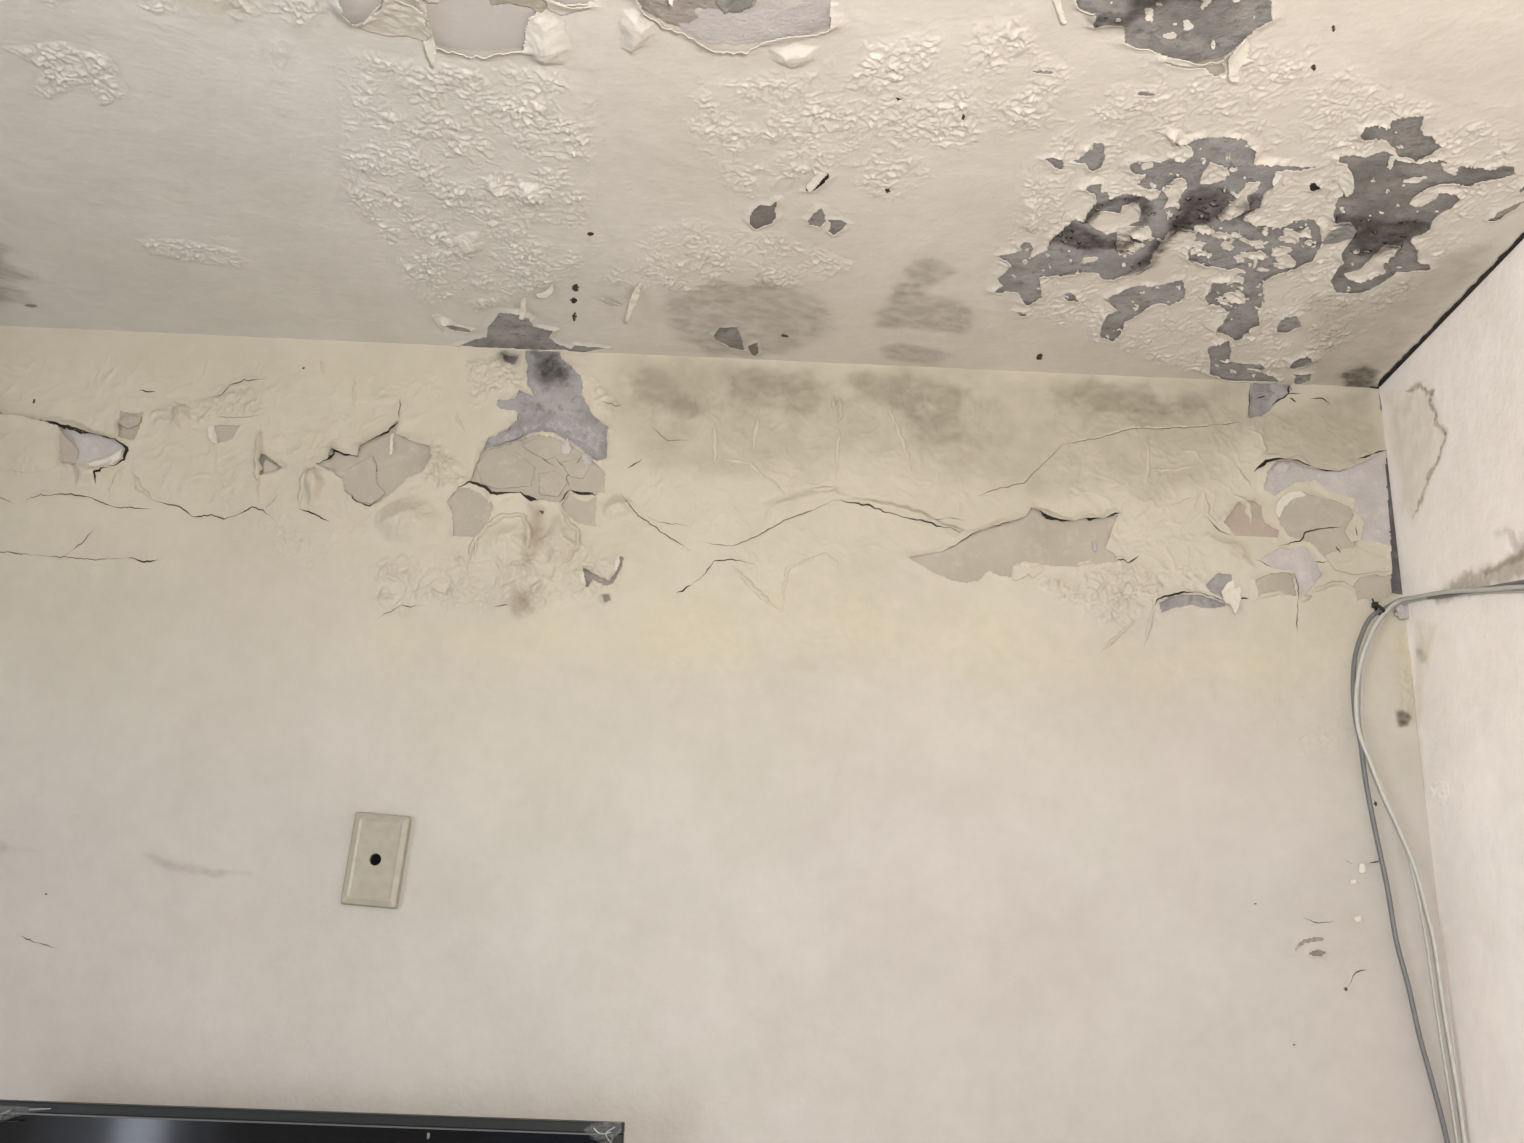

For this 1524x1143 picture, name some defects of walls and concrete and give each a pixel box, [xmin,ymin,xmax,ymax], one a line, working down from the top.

peeling [323,0,854,68]
spalling [1053,0,1288,85]
spalling [984,106,1524,424]
peeling [0,396,151,475]
crack [0,398,401,563]
crack [209,374,268,418]
peeling [250,412,439,513]
spalling [432,298,618,548]
peeling [896,498,1128,593]
crack [1153,585,1248,605]
peeling [1151,440,1403,623]
crack [1207,516,1357,632]